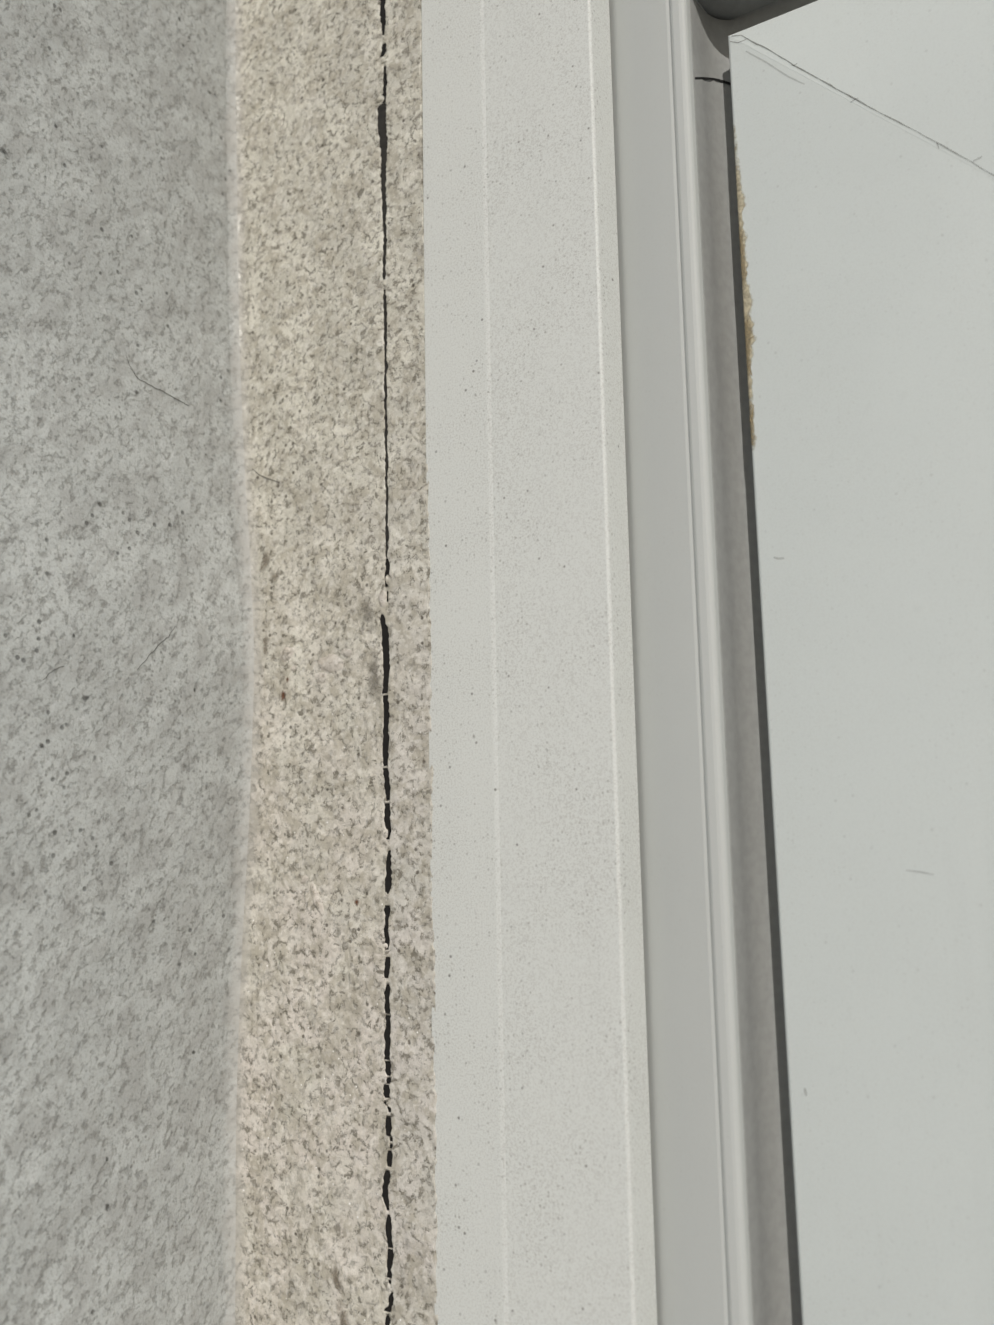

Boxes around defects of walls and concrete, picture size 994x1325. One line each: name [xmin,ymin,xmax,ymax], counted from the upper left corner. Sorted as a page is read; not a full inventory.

crack [376,0,394,1325]